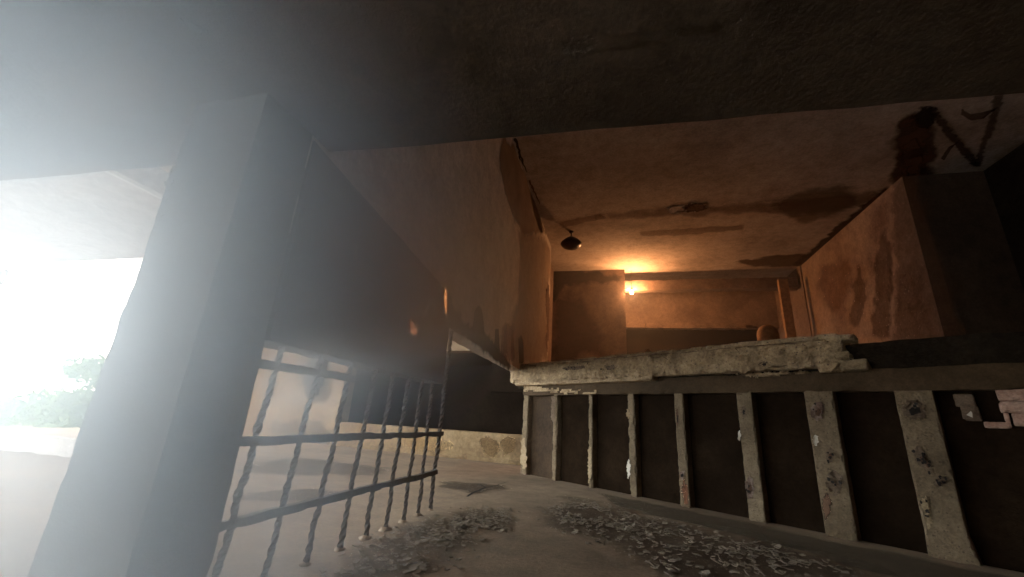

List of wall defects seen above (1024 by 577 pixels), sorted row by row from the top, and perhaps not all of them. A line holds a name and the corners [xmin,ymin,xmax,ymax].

crack [513,138,540,204]
leakage [739,95,1003,267]
flaking render [819,333,872,372]
flaking render [953,389,1024,429]